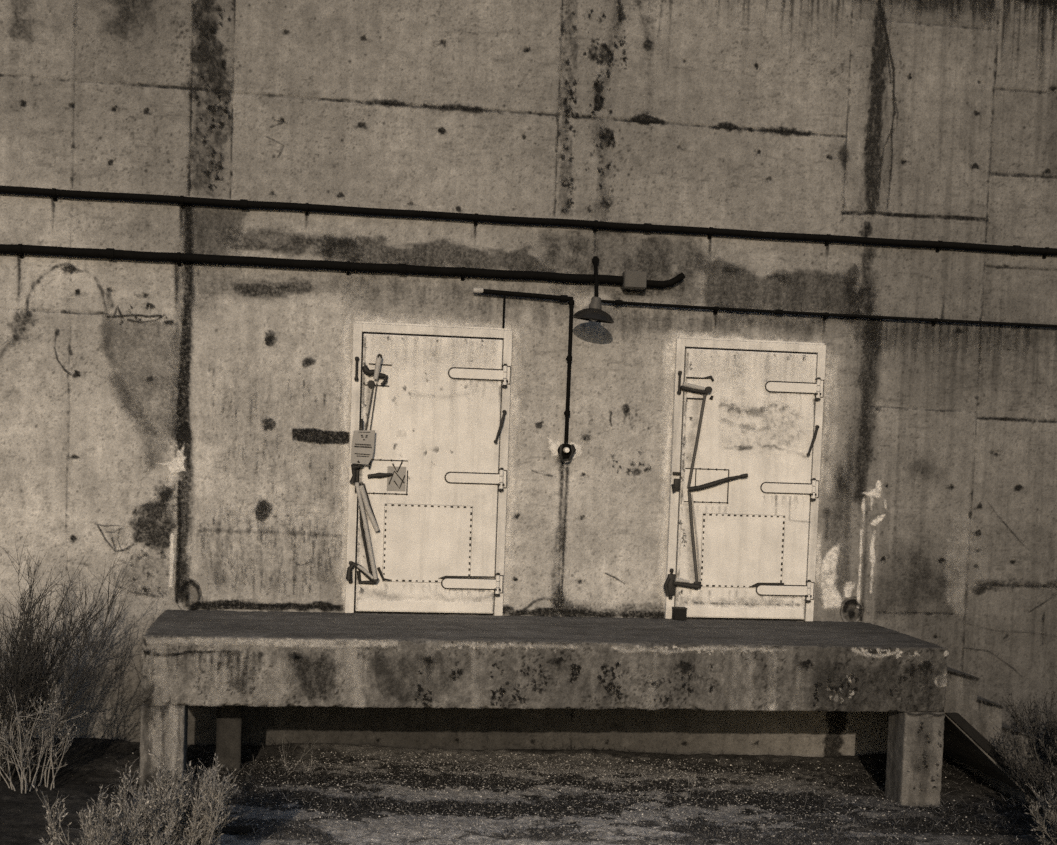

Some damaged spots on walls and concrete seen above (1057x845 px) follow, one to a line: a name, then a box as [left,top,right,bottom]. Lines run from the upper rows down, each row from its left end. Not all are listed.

leakage [919,0,1057,38]
leakage [365,100,488,113]
crack [878,0,898,207]
leakage [614,0,897,526]
leakage [11,300,32,344]
leakage [102,204,602,612]
leakage [503,590,665,619]
leakage [972,581,1057,594]